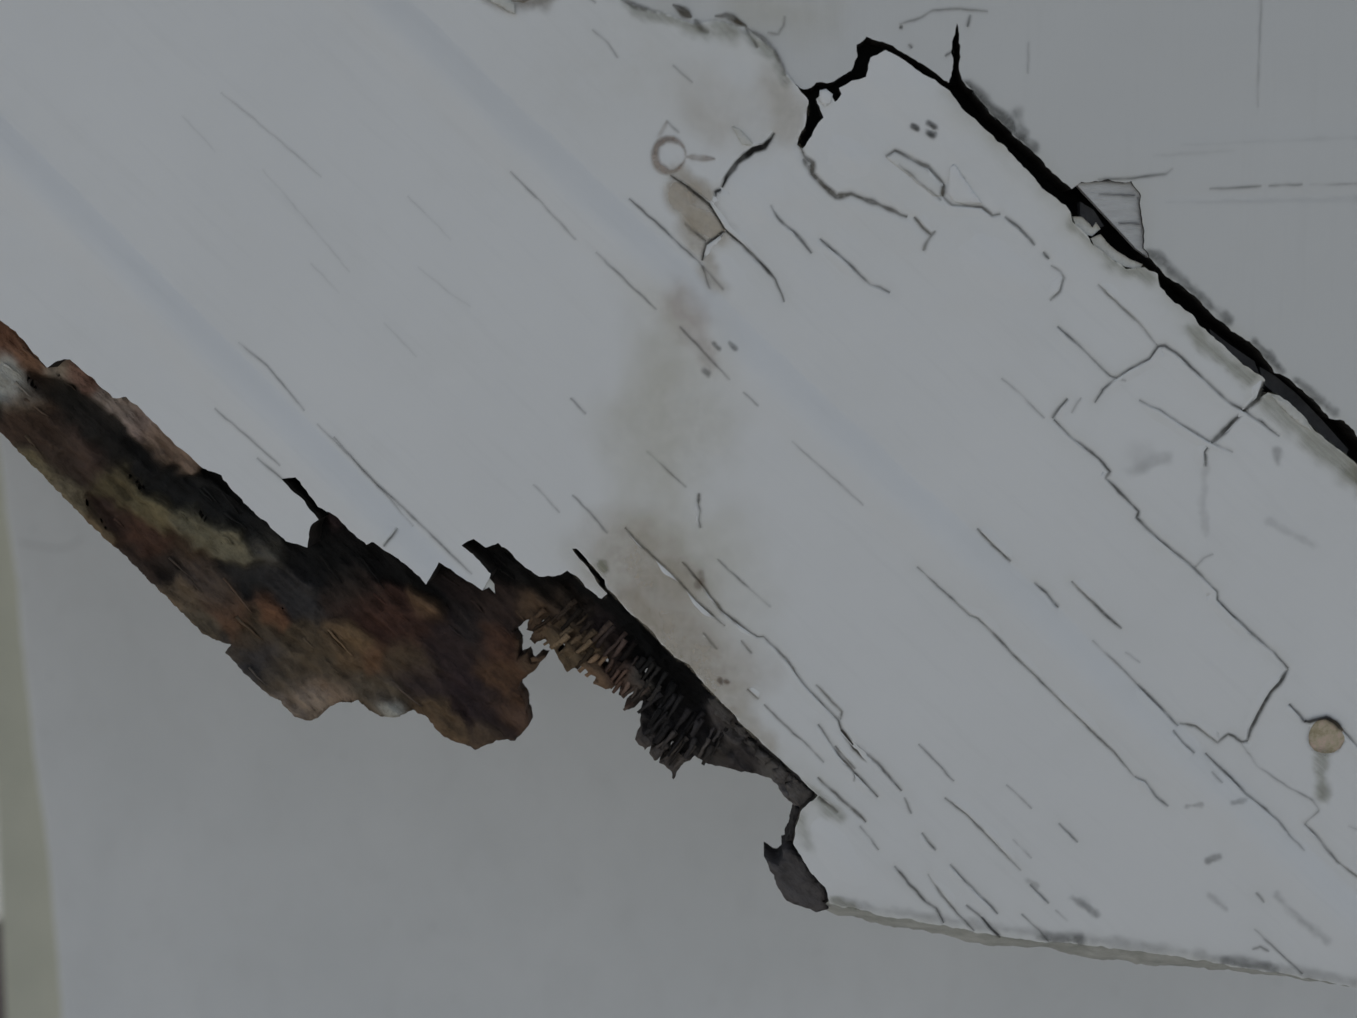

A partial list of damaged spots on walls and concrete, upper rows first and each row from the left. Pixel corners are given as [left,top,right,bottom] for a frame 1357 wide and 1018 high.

crack [672,4,692,18]
crack [725,14,758,48]
crack [670,27,1001,302]
peeling [1072,216,1143,269]
crack [1052,283,1305,742]
crack [978,525,1123,628]
crack [623,529,902,822]
spalling [764,804,829,912]
crack [898,834,1000,938]